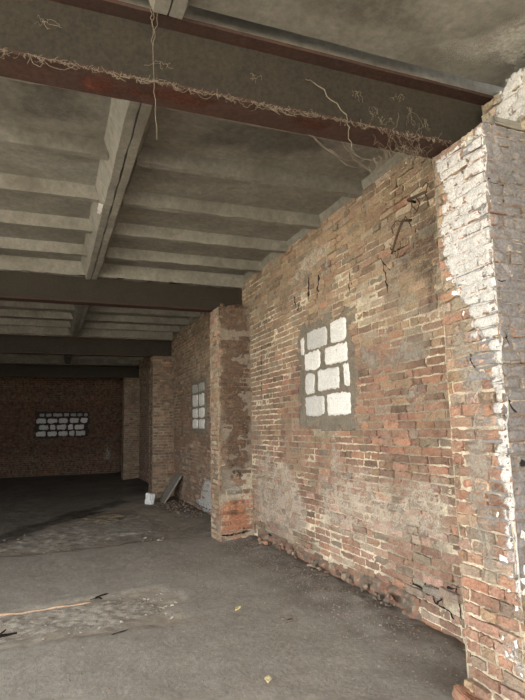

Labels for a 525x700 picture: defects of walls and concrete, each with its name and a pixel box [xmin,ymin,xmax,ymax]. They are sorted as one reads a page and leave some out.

spalling [218,303,252,481]
peeling [435,68,525,611]
crack [410,582,462,619]
peeling [501,635,525,678]